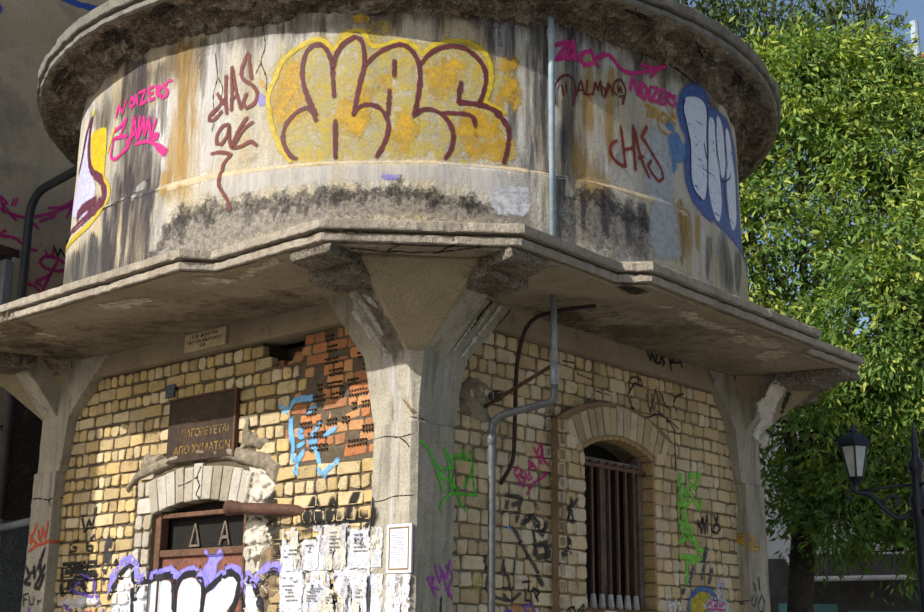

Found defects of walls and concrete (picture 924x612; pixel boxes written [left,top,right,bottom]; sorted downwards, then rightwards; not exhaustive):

spalling [151,0,187,33]
spalling [51,19,133,93]
crack [212,54,223,131]
crack [256,24,267,98]
water stain [63,40,533,285]
spalling [262,334,306,367]
flaking render [753,380,794,448]